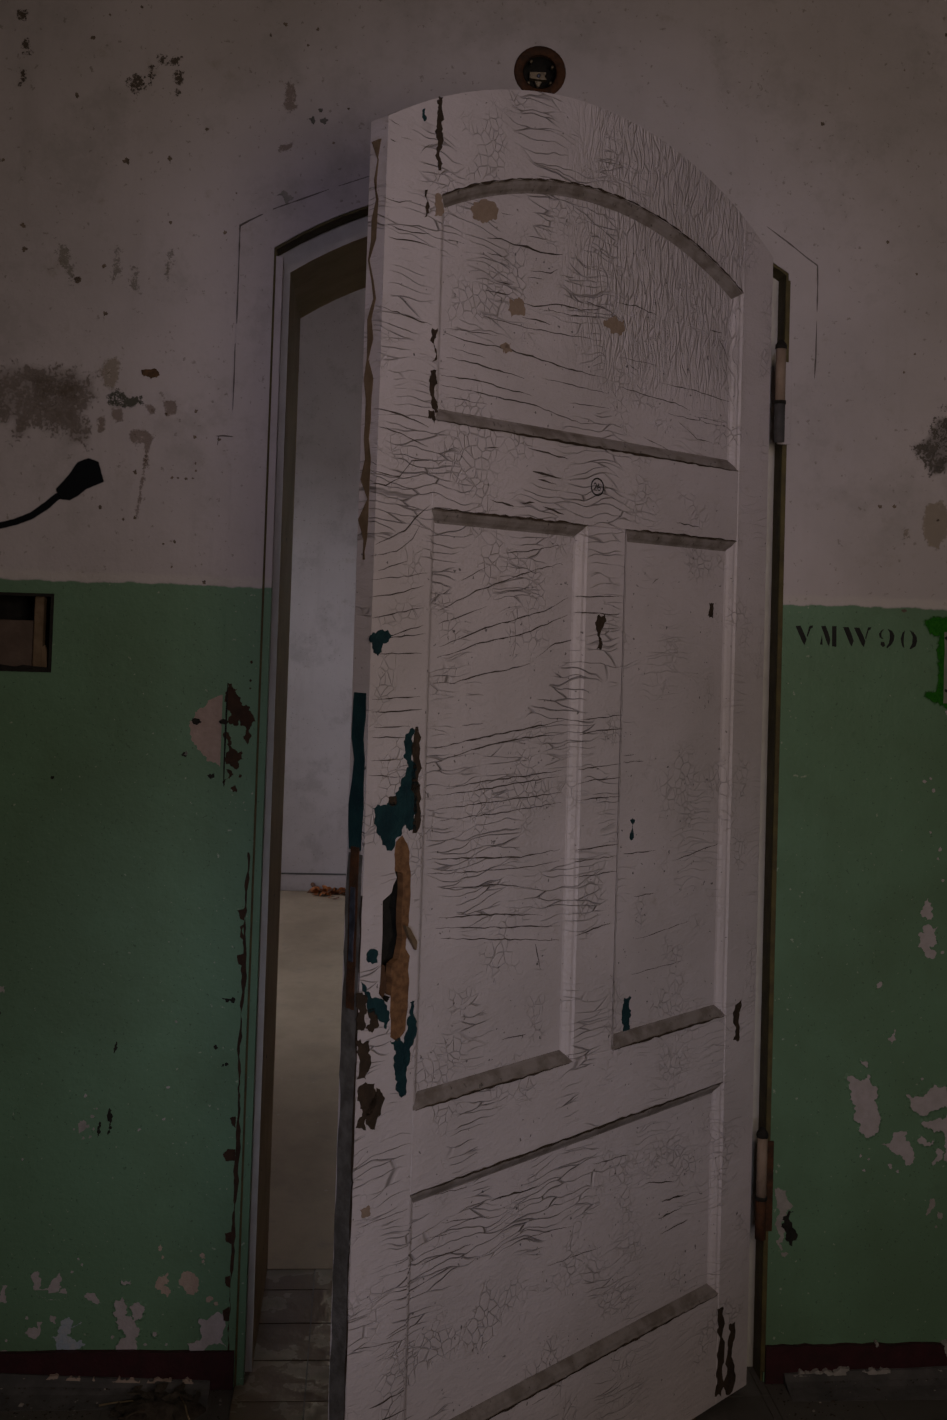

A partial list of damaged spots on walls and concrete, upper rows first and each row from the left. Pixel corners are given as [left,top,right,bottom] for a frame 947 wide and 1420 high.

damp [0,360,144,450]
crack [370,408,429,486]
crack [370,447,619,684]
crack [369,696,641,821]
spalling [381,895,393,965]
crack [427,844,717,975]
peeling [918,899,944,959]
peeling [843,1058,947,1173]
crack [423,1186,538,1264]
peeling [25,1258,85,1350]
peeling [84,1279,168,1350]
peeling [155,1245,226,1351]